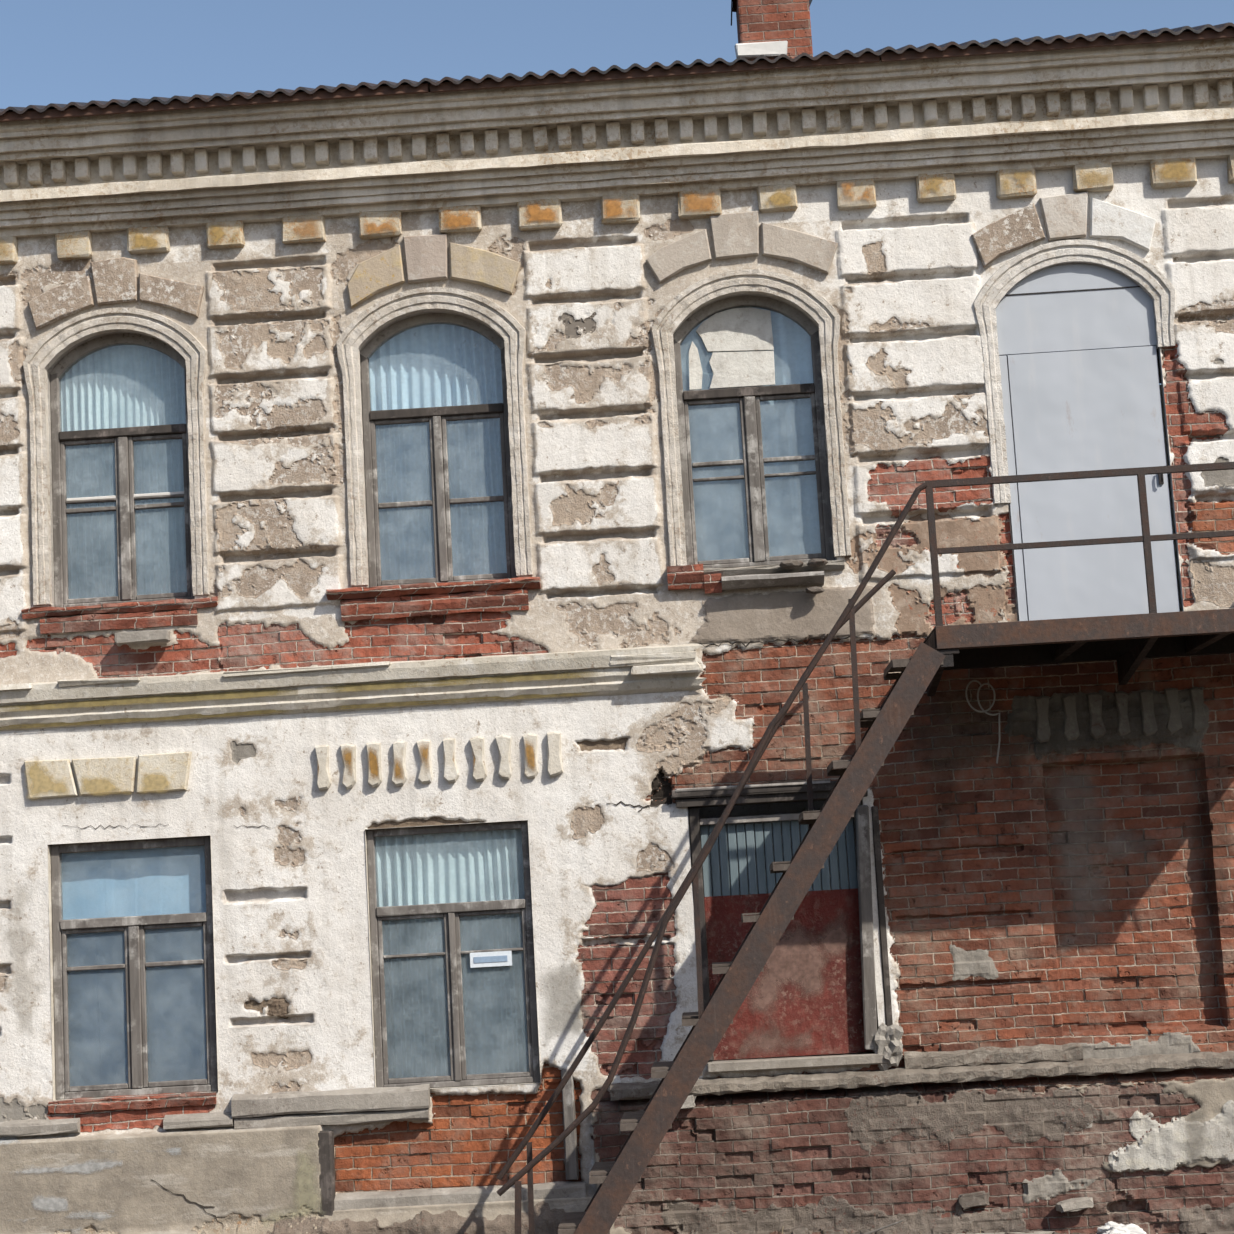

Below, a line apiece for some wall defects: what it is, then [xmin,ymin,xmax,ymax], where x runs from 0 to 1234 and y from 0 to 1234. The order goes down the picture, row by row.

peeling [1176,297,1234,334]
flaking render [0,612,549,678]
peeling [206,237,399,600]
peeling [550,480,619,526]
peeling [556,553,681,650]
flaking render [577,305,1018,806]
flaking render [1162,343,1234,607]
peeling [274,796,305,867]
flaking render [846,653,1234,1071]
flaking render [334,842,677,1193]
crack [151,1179,224,1228]
flaking render [614,1068,1234,1234]